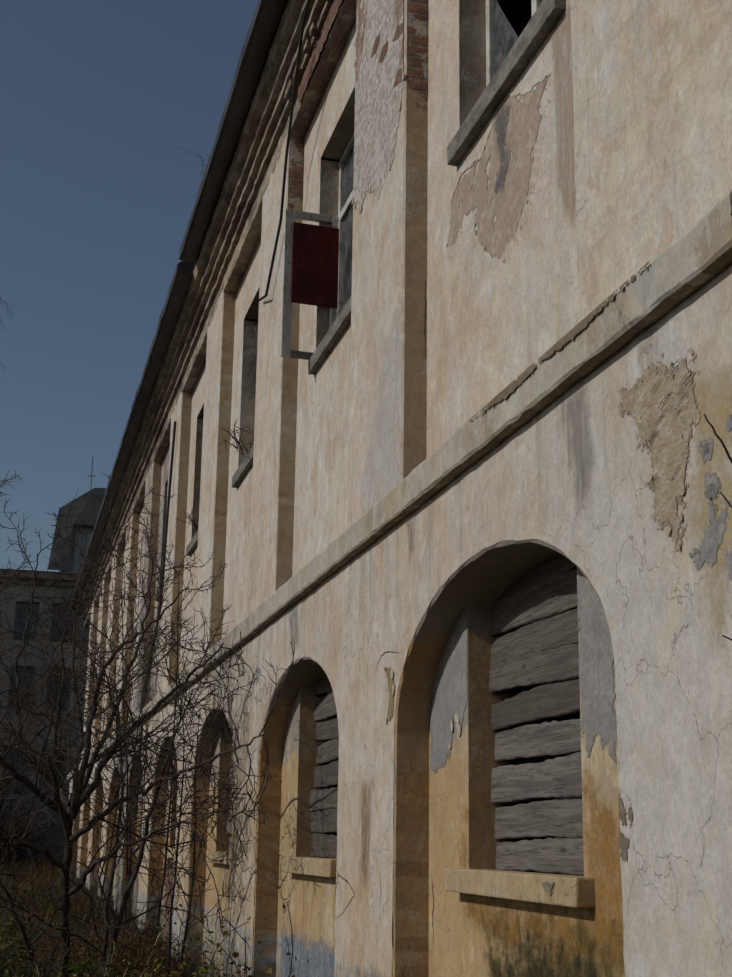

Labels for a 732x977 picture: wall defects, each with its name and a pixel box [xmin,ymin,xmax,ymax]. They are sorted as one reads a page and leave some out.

flaking render [288,138,304,210]
flaking render [284,0,342,103]
peeling [352,0,428,214]
peeling [442,60,556,277]
spalling [618,348,732,581]
peeling [430,608,467,774]
leakage [467,787,624,977]